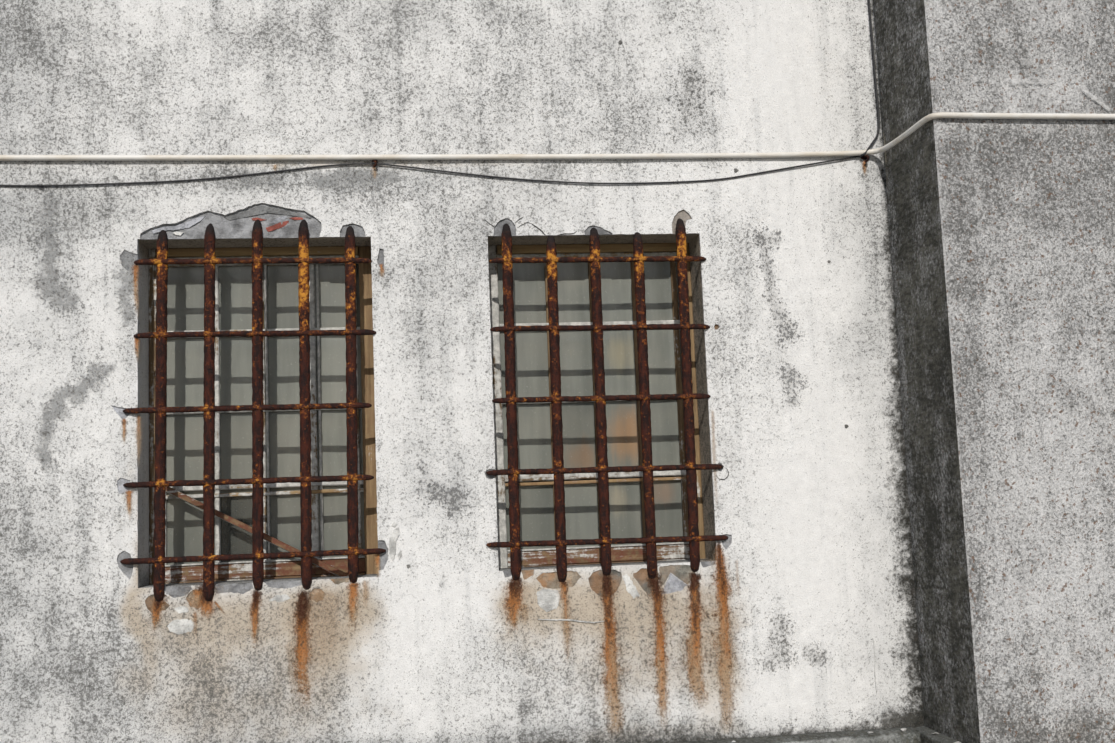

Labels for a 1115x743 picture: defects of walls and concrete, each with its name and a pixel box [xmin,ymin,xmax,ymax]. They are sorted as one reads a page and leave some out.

damp [34,197,78,313]
spalling [120,250,138,271]
spalling [140,203,322,240]
damp [35,364,113,469]
damp [545,0,924,743]
damp [413,462,468,518]
corrosion [293,590,311,696]
corrosion [506,578,526,627]
spalling [503,561,714,612]
corrosion [601,575,621,730]
corrosion [648,573,668,716]
corrosion [686,541,734,721]